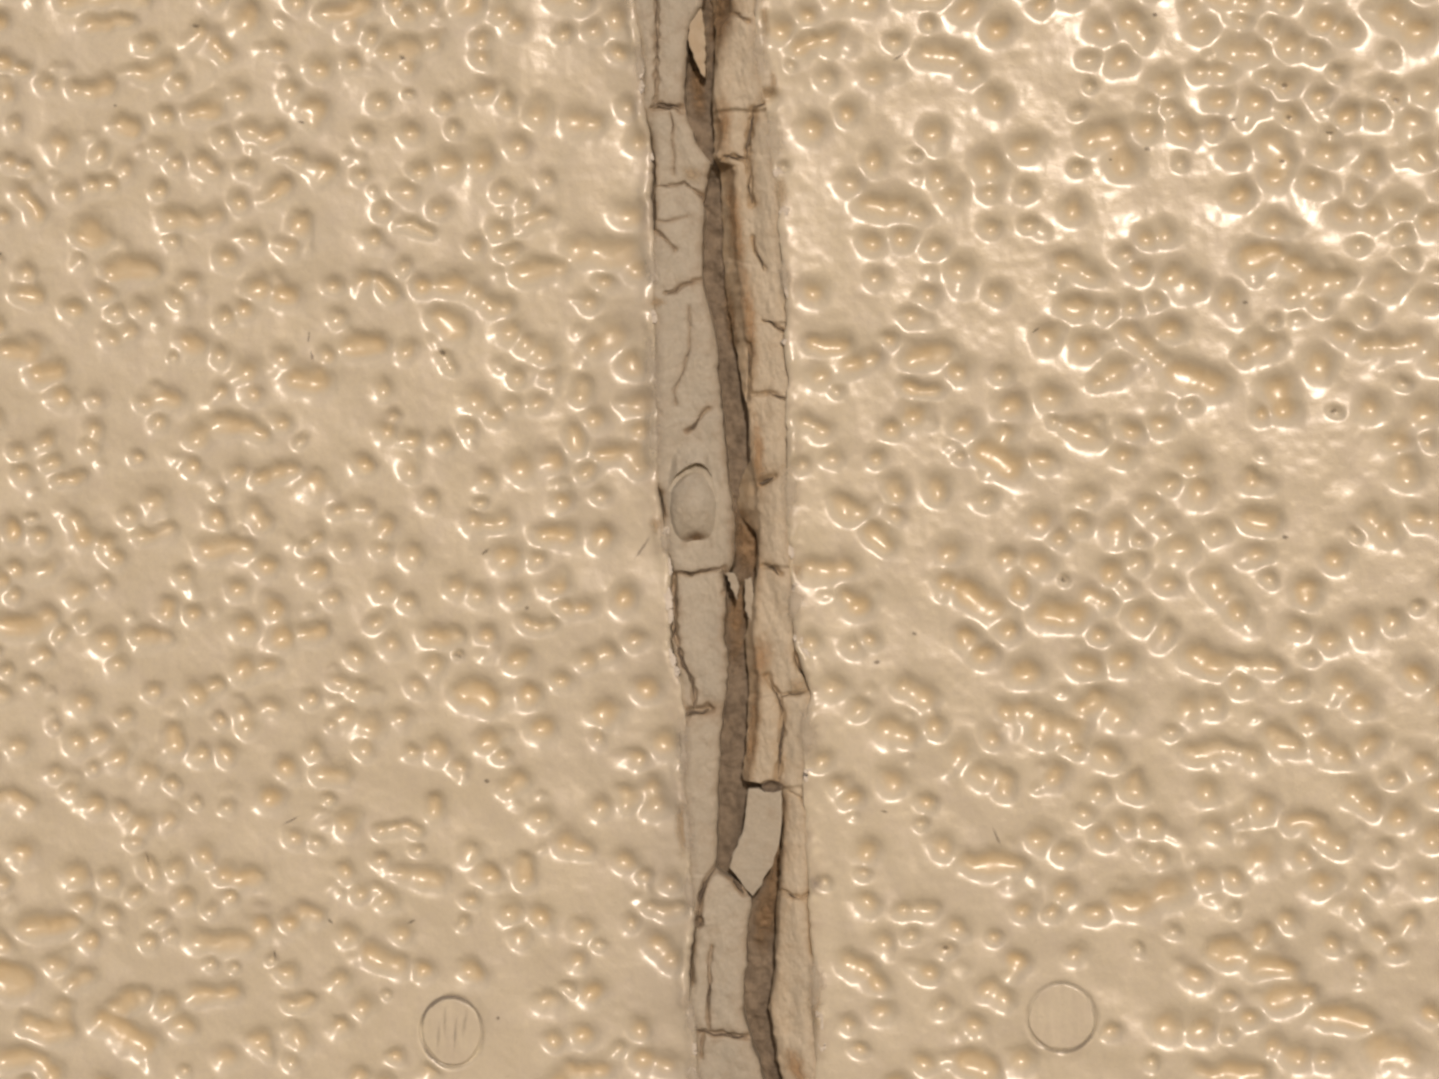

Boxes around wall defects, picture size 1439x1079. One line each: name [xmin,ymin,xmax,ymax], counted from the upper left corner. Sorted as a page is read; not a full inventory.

crack [651,0,809,1079]